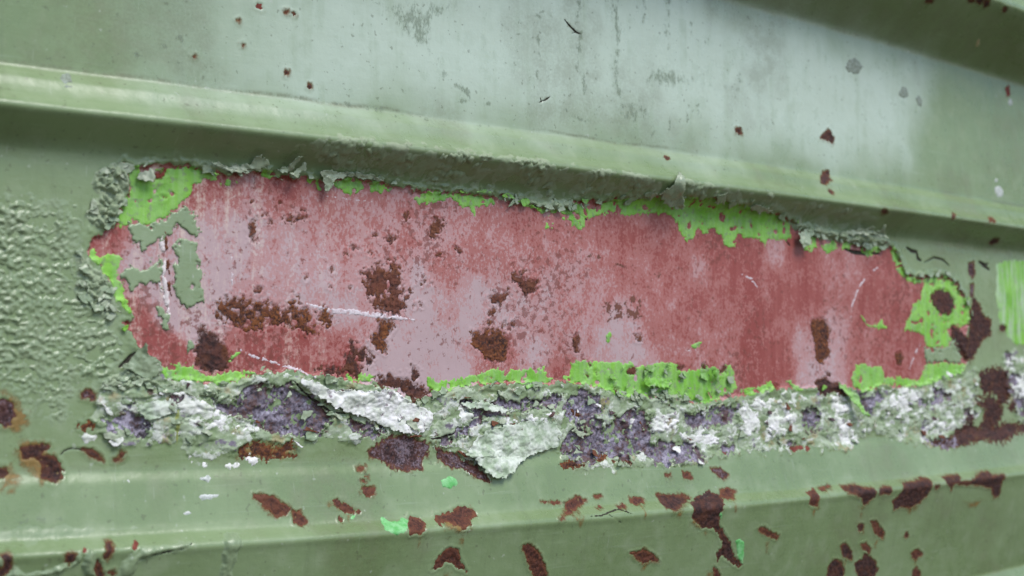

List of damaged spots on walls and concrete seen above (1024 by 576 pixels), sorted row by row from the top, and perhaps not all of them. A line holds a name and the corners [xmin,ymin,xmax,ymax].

corrosion [194,286,334,374]
corrosion [314,244,433,403]
corrosion [470,264,541,362]
peeling [81,155,983,501]
corrosion [811,319,849,398]
corrosion [929,261,1024,451]
corrosion [0,392,66,492]
corrosion [253,493,308,527]
corrosion [356,432,492,498]
corrosion [408,506,478,573]
corrosion [617,466,742,576]
corrosion [805,470,1006,576]